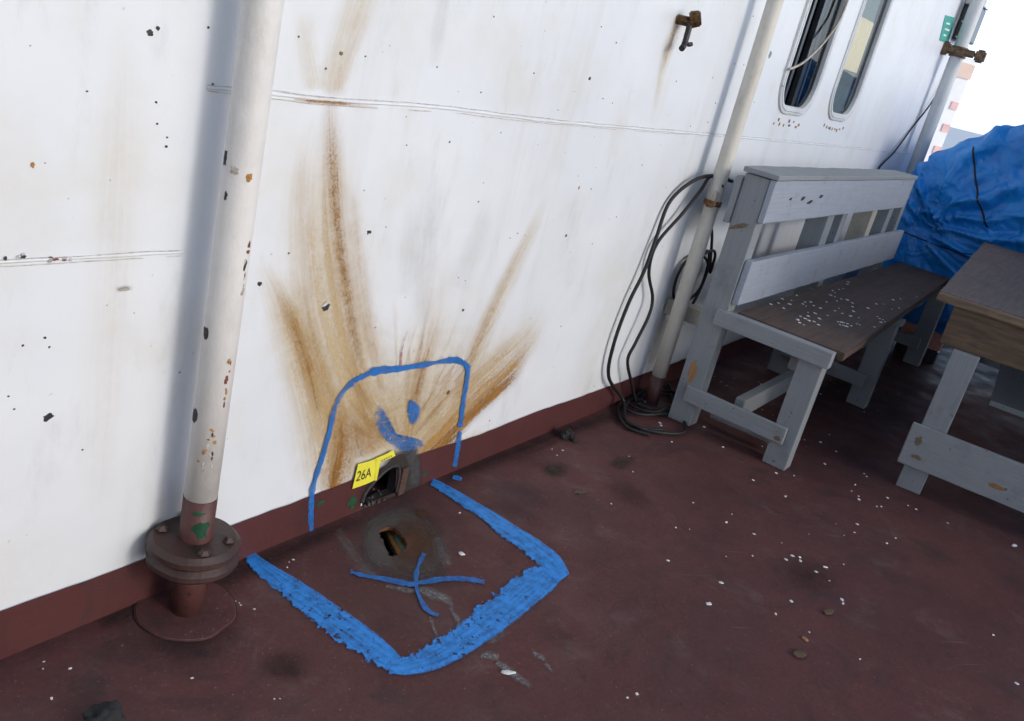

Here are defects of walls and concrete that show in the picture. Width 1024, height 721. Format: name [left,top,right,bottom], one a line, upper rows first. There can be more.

peeling [197,429,216,472]
corrosion [281,237,409,488]
corrosion [418,347,519,454]
peeling [363,509,465,605]